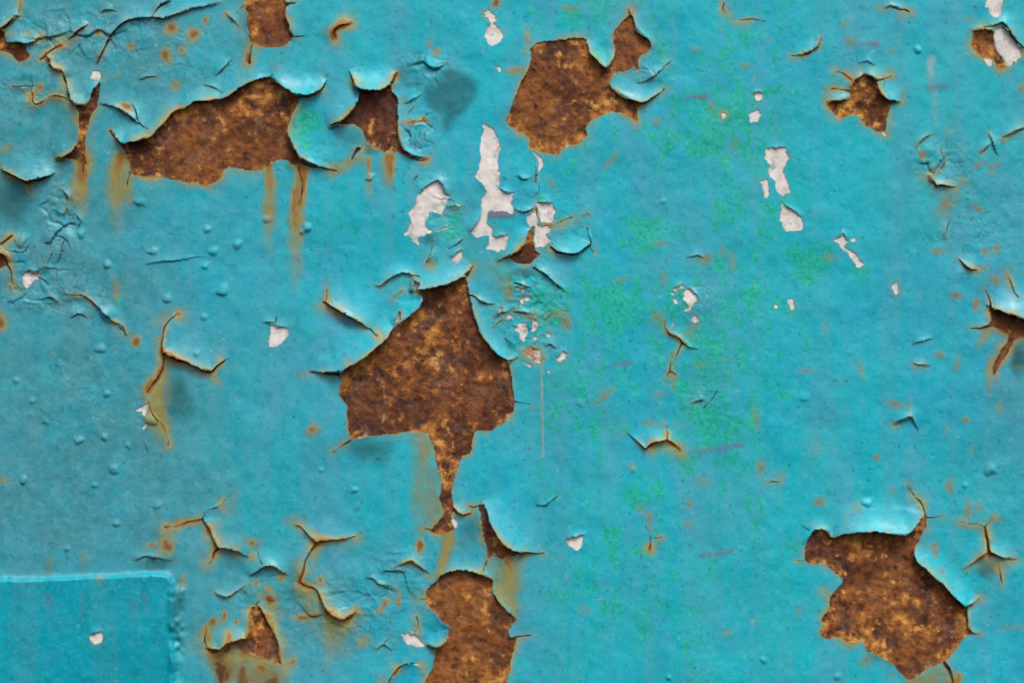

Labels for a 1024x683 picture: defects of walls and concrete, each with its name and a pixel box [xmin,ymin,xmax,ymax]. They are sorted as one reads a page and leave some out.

rust [109,0,430,244]
peeling [404,176,459,245]
peeling [467,123,514,252]
peeling [527,199,556,248]
rust [507,7,665,155]
peeling [761,146,804,232]
crack [140,310,226,454]
rust [308,259,544,683]
crack [628,428,683,455]
crack [134,500,359,633]
rust [796,487,982,683]
crack [959,520,1018,584]